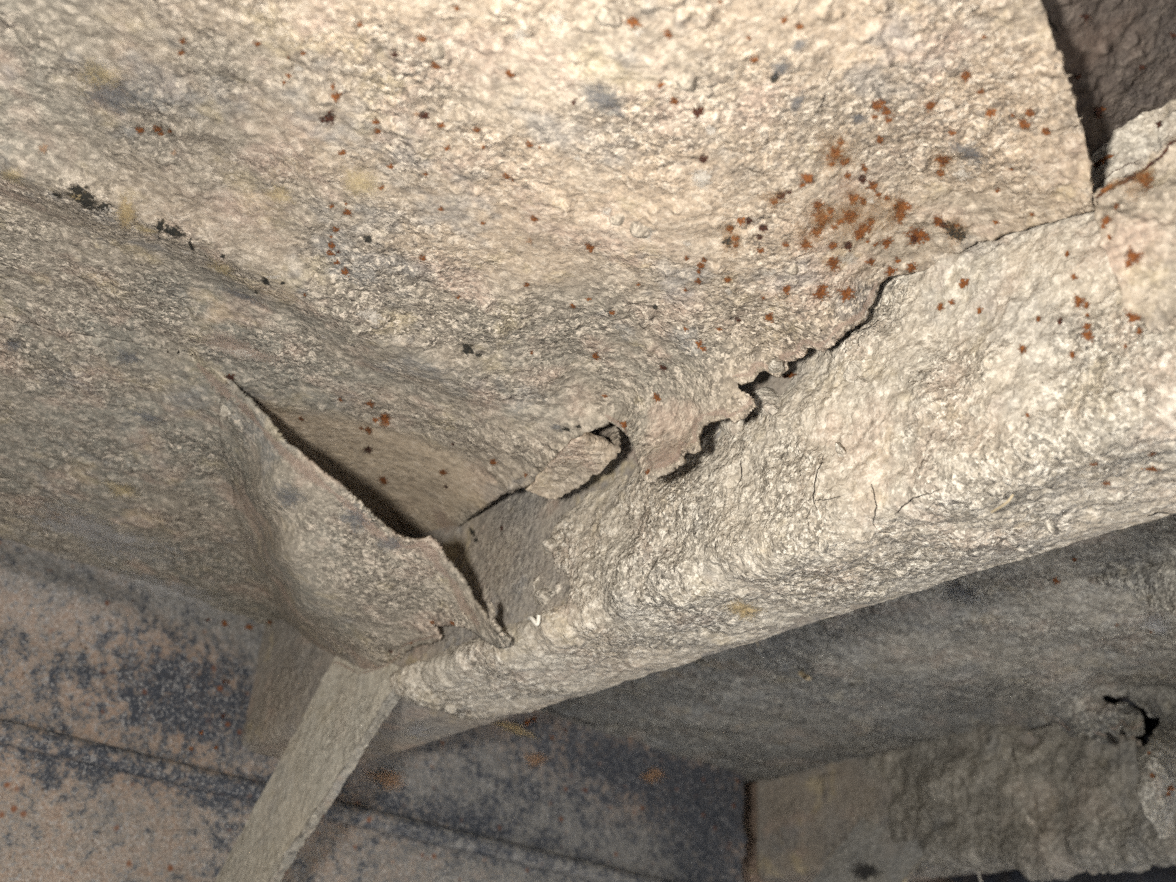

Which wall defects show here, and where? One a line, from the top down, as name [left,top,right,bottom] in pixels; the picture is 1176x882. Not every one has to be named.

corrosion [318,83,341,125]
corrosion [871,100,894,123]
corrosion [1011,109,1051,136]
corrosion [769,173,813,205]
corrosion [782,138,968,276]
corrosion [326,227,349,277]
corrosion [721,217,768,253]
corrosion [812,284,855,303]
corrosion [1073,295,1094,343]